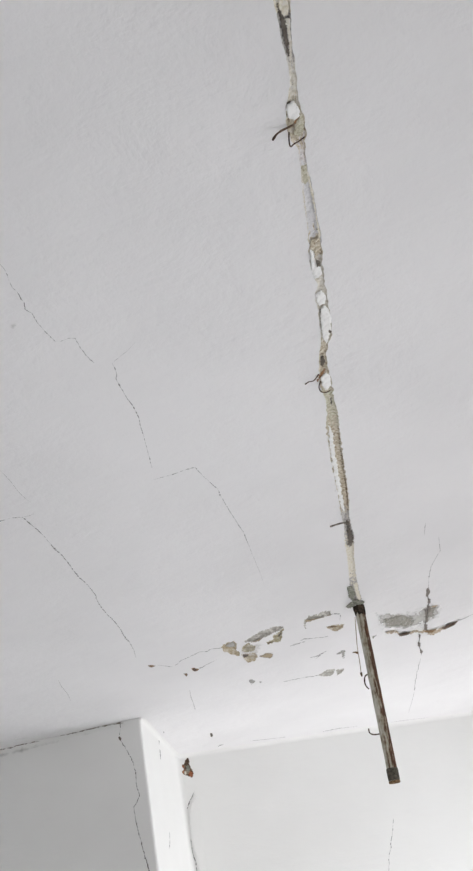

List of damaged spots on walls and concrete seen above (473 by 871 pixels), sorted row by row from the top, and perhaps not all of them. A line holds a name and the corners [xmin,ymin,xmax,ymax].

flaking render [286,101,300,120]
flaking render [309,249,322,279]
flaking render [321,373,331,390]
flaking render [328,425,345,511]
flaking render [221,626,284,663]
flaking render [298,611,344,644]
flaking render [385,621,458,636]
crack [403,544,440,721]
flaking render [312,669,344,677]